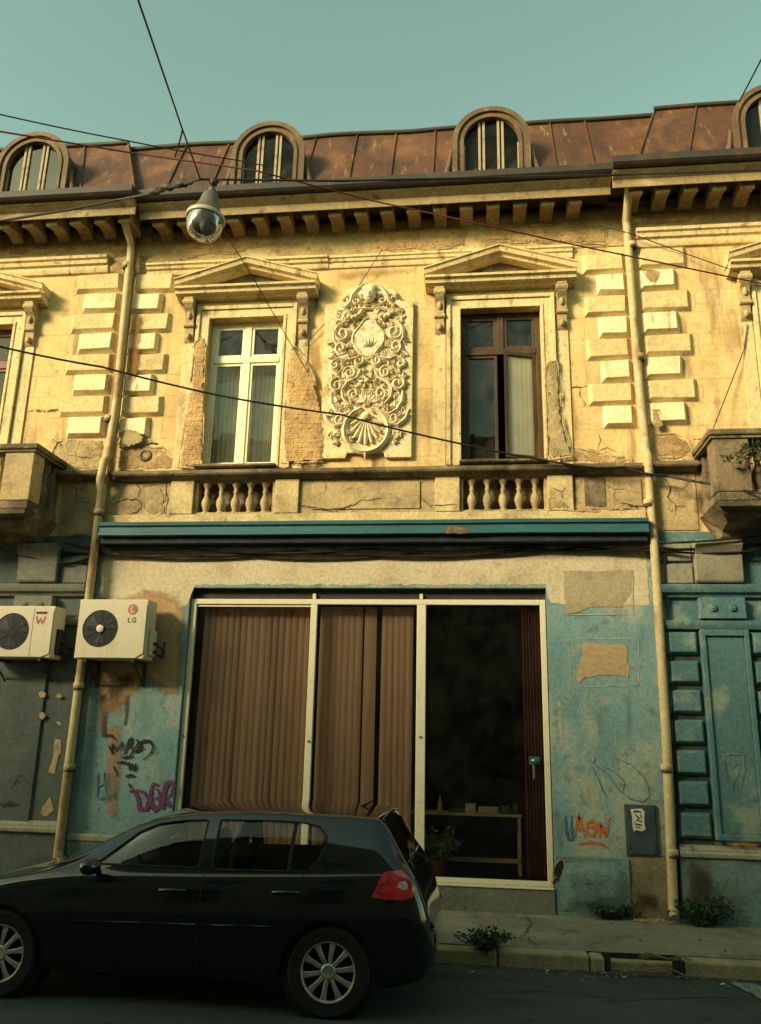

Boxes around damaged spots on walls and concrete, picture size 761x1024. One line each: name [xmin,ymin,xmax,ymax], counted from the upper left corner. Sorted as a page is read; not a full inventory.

spalling [118,336,207,471]
spalling [281,345,324,464]
crack [69,481,169,515]
crack [300,481,379,513]
peeling [445,525,469,534]
peeling [564,570,634,615]
peeling [568,638,640,687]
peeling [48,739,61,774]
peeling [31,797,54,816]